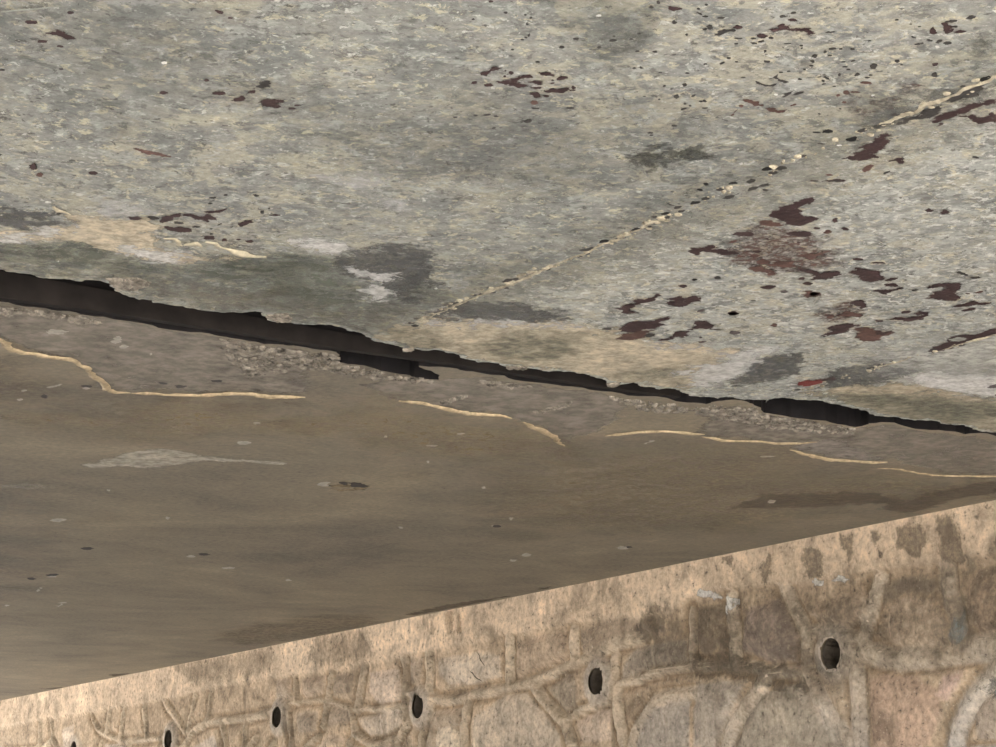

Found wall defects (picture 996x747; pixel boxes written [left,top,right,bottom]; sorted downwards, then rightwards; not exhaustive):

corrosion [849,84,921,115]
corrosion [728,224,844,273]
spalling [266,313,293,323]
corrosion [815,300,863,322]
crack [0,338,305,399]
spalling [219,338,434,385]
crack [399,401,565,446]
crack [605,430,996,478]